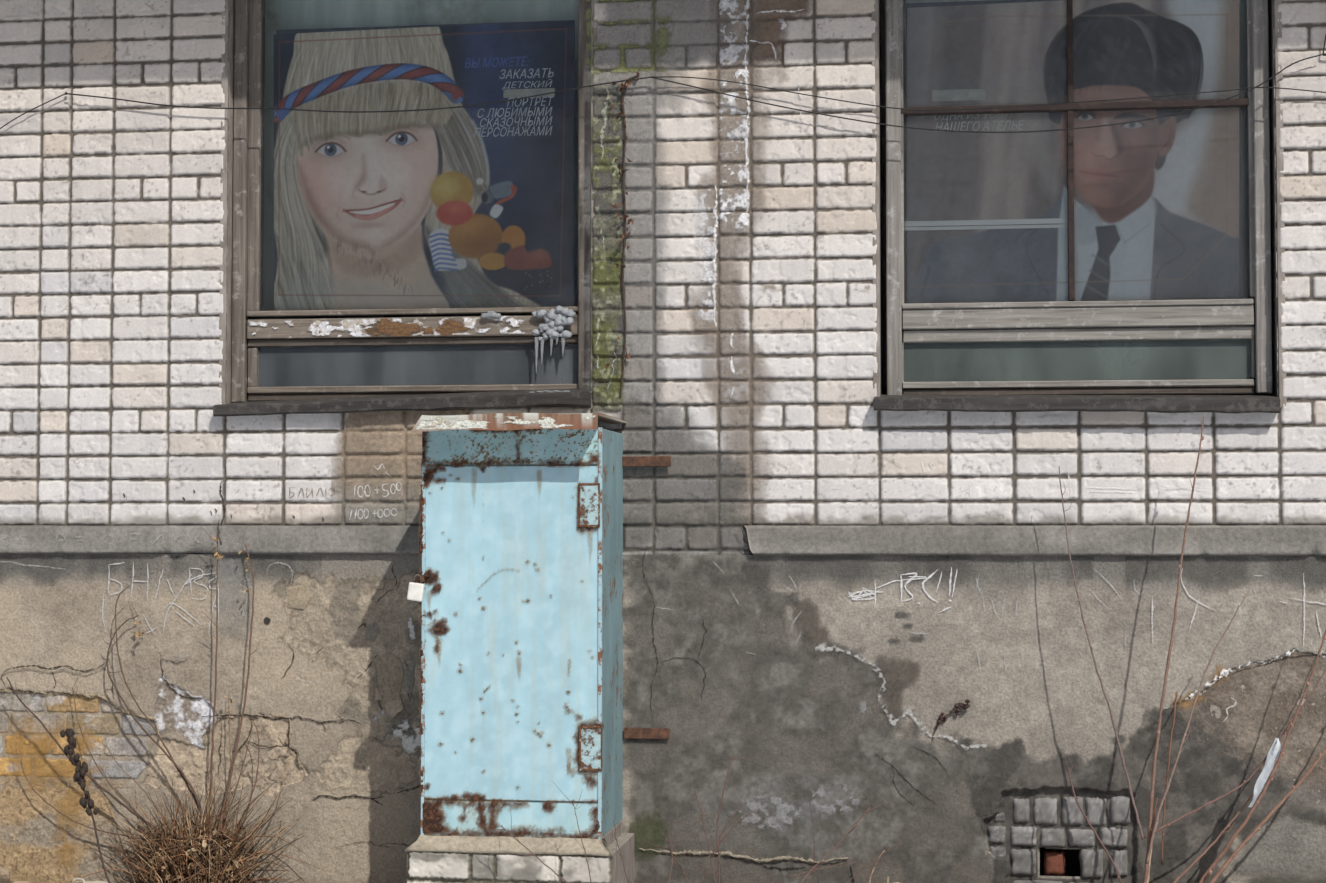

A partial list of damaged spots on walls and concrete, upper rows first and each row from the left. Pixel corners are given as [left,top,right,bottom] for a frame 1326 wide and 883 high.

peeling [249,316,525,338]
leakage [594,0,1326,883]
peeling [0,570,422,883]
crack [159,652,362,733]
flaking render [1163,648,1326,803]
crack [640,848,854,883]
hole [1040,847,1080,876]